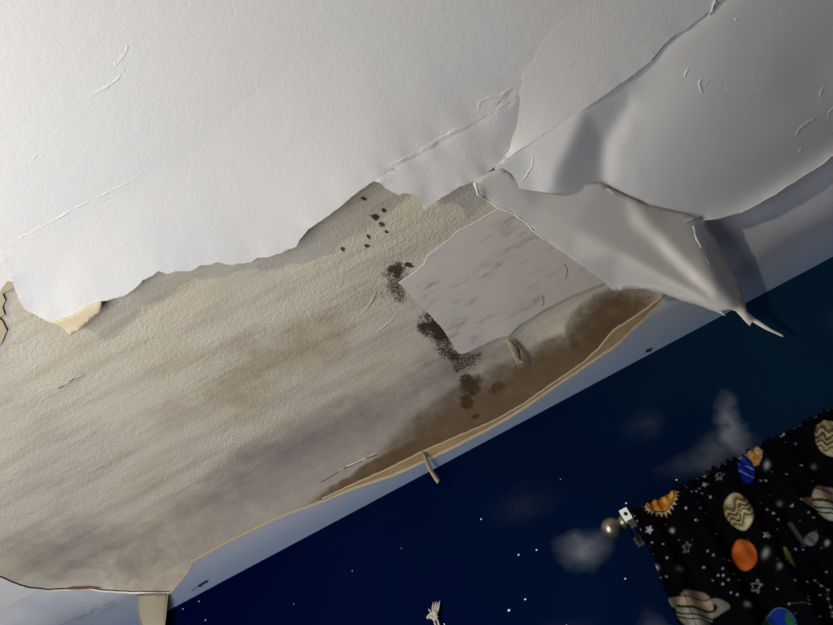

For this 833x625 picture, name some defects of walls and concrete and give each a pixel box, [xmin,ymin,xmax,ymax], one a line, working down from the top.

flaking render [0,181,666,594]
damp [178,292,650,564]